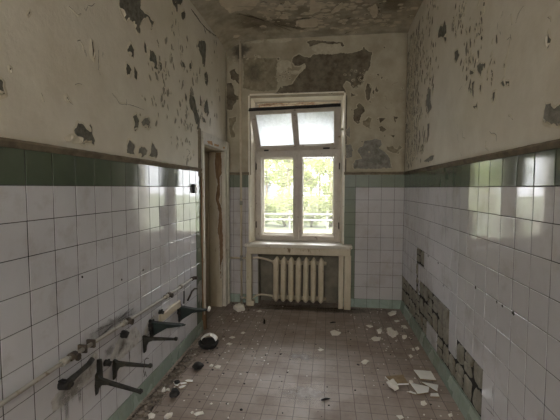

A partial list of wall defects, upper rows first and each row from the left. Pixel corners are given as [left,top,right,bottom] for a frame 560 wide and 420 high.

peeling [118,0,510,171]
peeling [542,101,560,129]
peeling [73,120,96,147]
peeling [402,247,483,417]
spalling [385,370,439,398]